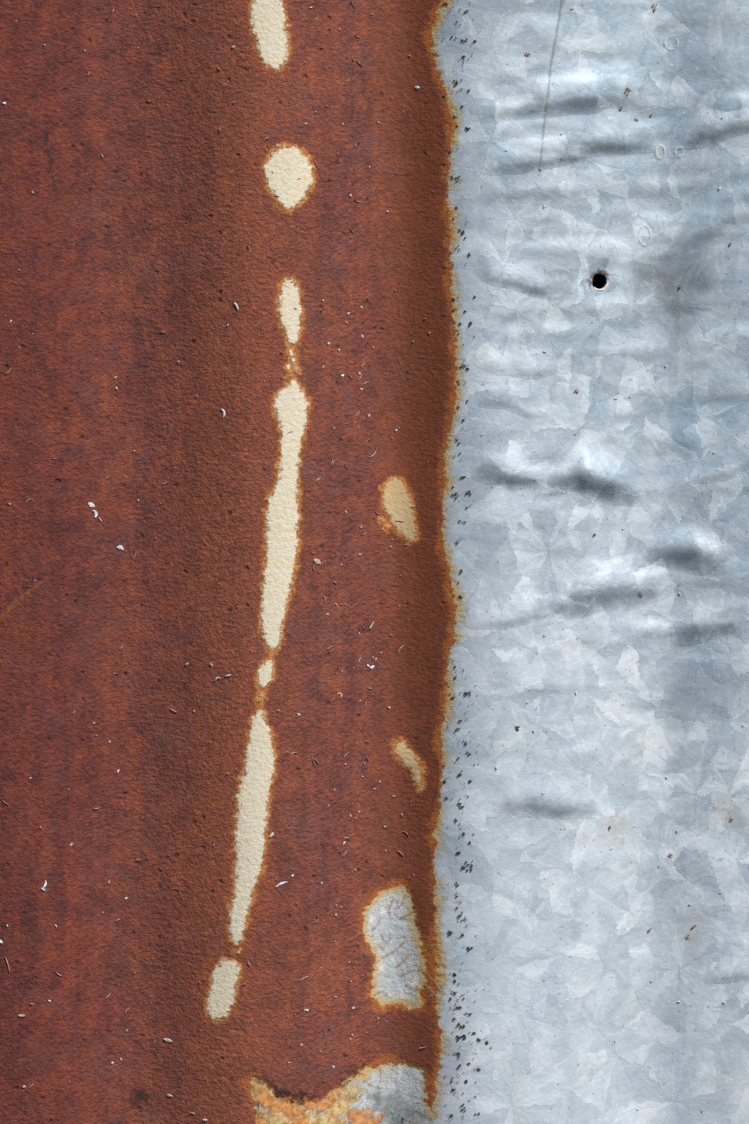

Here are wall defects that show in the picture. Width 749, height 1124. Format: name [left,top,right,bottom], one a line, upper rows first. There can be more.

rust [0,0,466,1124]
peeling [250,888,492,1124]